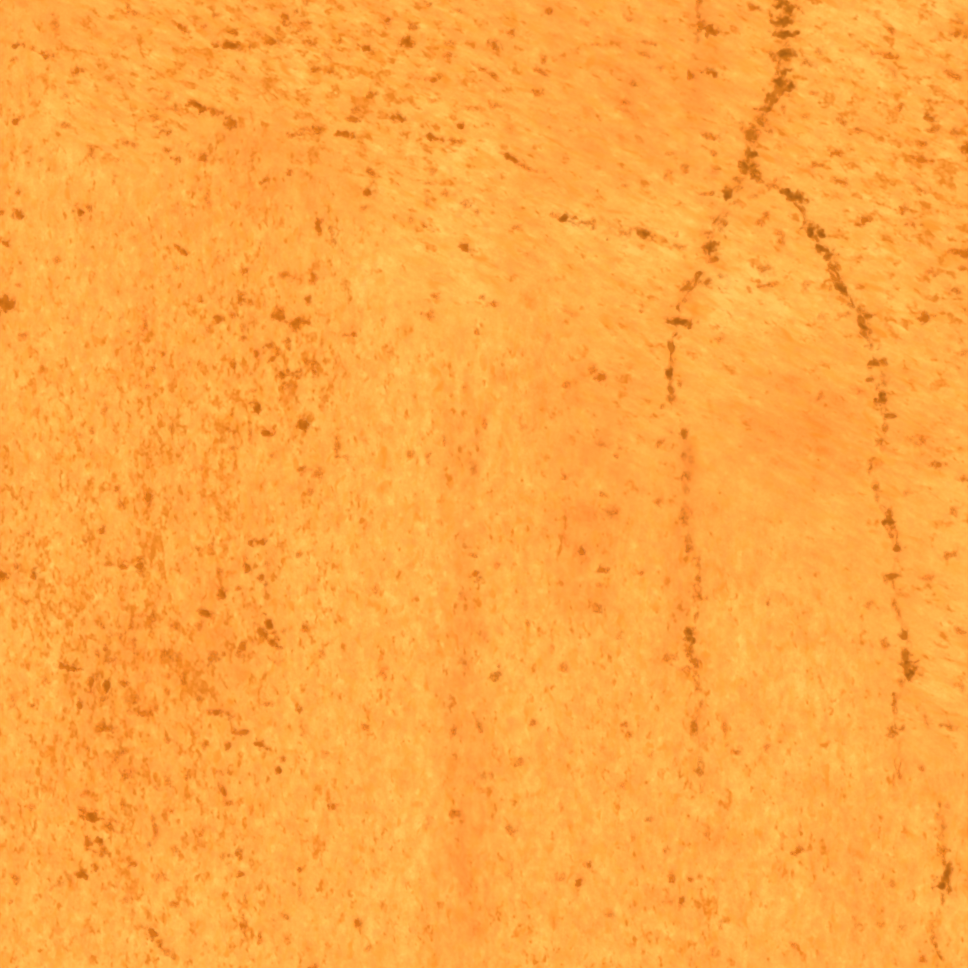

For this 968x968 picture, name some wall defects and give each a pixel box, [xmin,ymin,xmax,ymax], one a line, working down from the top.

crack [665,0,896,444]
crack [680,429,688,478]
crack [685,576,701,667]
crack [882,509,917,735]